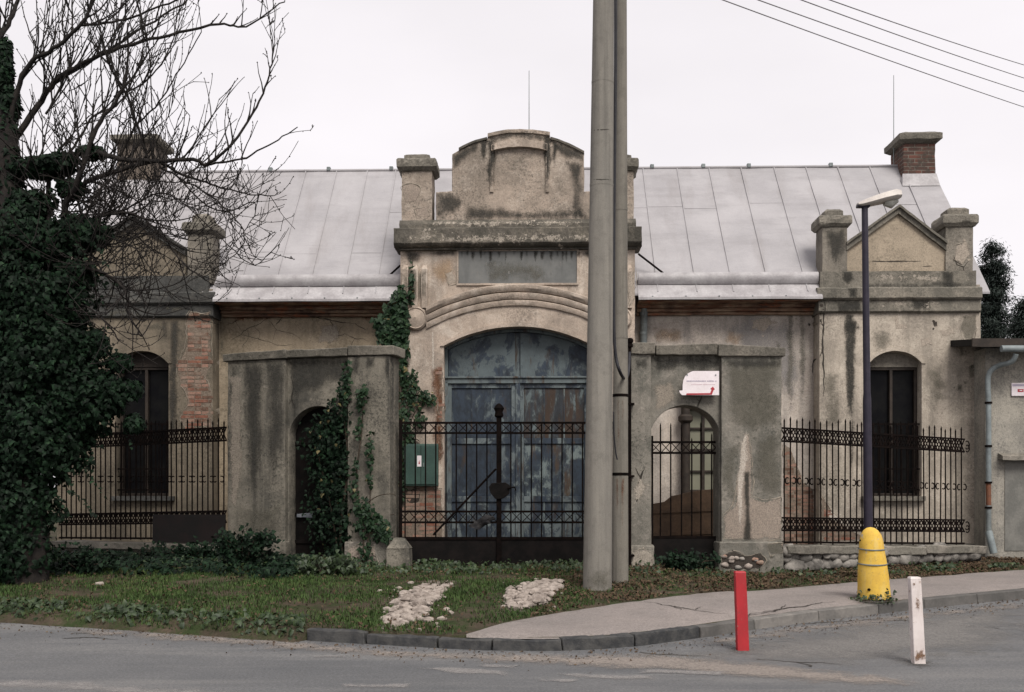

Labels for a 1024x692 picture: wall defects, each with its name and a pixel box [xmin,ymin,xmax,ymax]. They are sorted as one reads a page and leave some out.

leakage [481,141,496,183]
leakage [544,136,558,178]
flaking render [167,307,220,433]
leakage [244,364,282,479]
flaking render [402,486,445,537]
leakage [726,366,780,540]
peeling [721,433,861,571]
leakage [839,272,860,440]